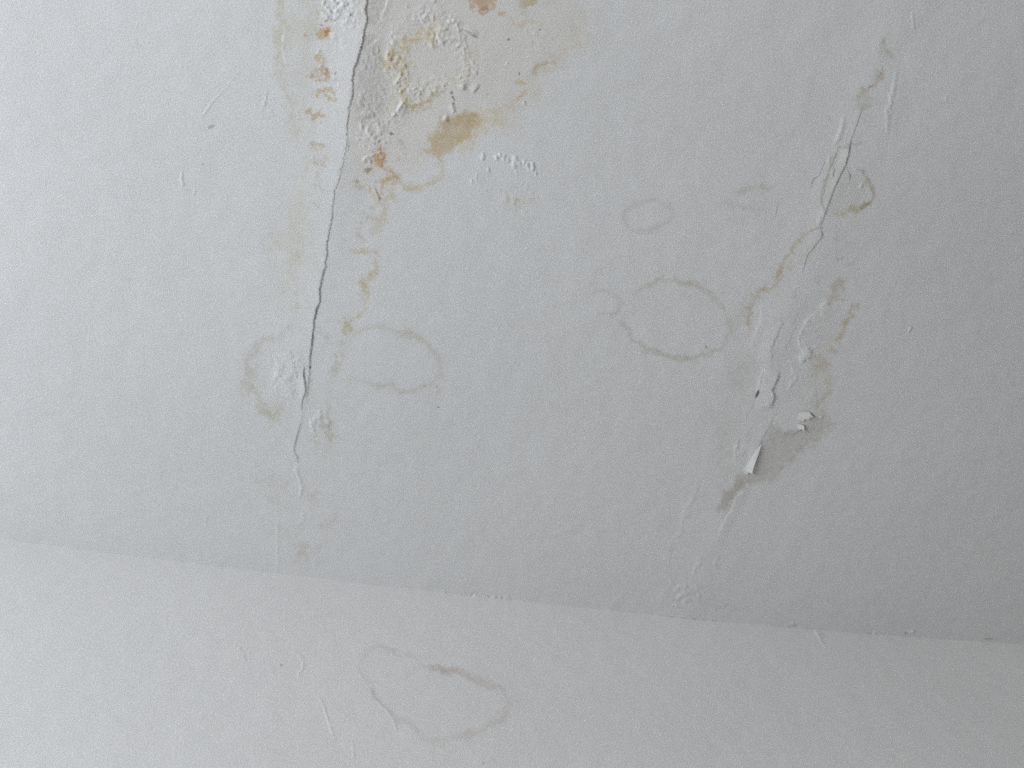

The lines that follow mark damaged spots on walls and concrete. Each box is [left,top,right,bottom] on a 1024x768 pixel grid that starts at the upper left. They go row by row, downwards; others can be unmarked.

crack [285,1,368,499]
water stain [236,0,599,432]
water stain [618,138,878,365]
crack [794,106,863,298]
peeling [700,345,841,519]